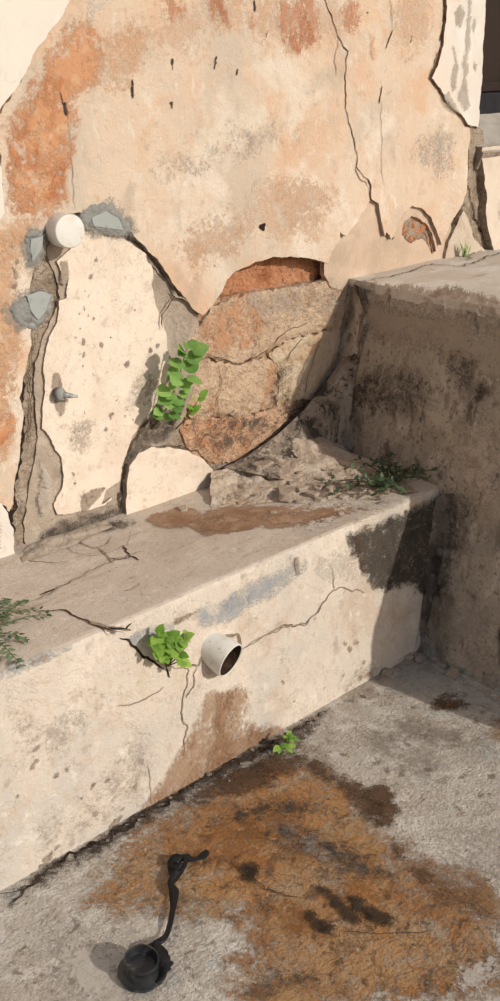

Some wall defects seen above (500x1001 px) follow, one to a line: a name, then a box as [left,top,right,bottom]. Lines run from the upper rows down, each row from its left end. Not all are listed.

crack [325,0,385,201]
spalling [429,9,476,130]
peeling [52,373,66,417]
peeling [60,261,70,285]
spalling [174,201,451,464]
damp [352,363,442,416]
damp [359,280,500,404]
peeling [81,487,105,511]
crack [0,322,331,908]
damp [42,420,500,779]
crack [225,567,367,650]
damp [82,686,500,1001]